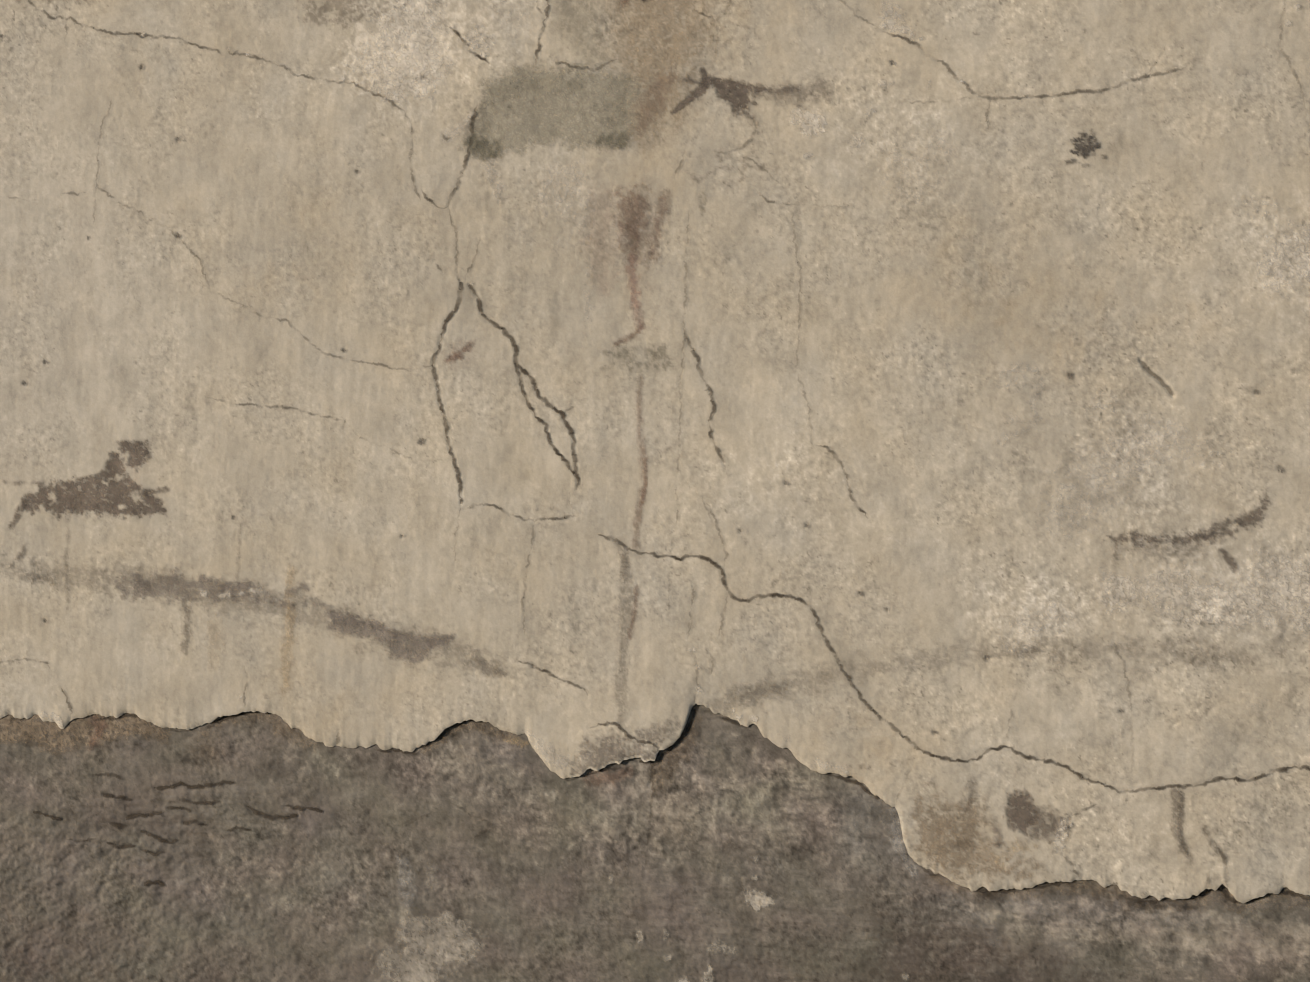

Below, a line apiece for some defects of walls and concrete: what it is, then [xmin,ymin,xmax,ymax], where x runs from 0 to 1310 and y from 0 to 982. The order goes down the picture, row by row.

water stain [464,134,499,160]
crack [431,282,579,517]
crack [686,337,722,459]
flaking render [9,441,168,527]
flaking render [1110,499,1269,568]
crack [601,535,1310,792]
flaking render [0,713,168,755]
crack [380,720,482,754]
crack [583,687,739,797]
crack [835,776,878,800]
flaking render [1007,790,1071,846]
peeling [704,942,733,982]